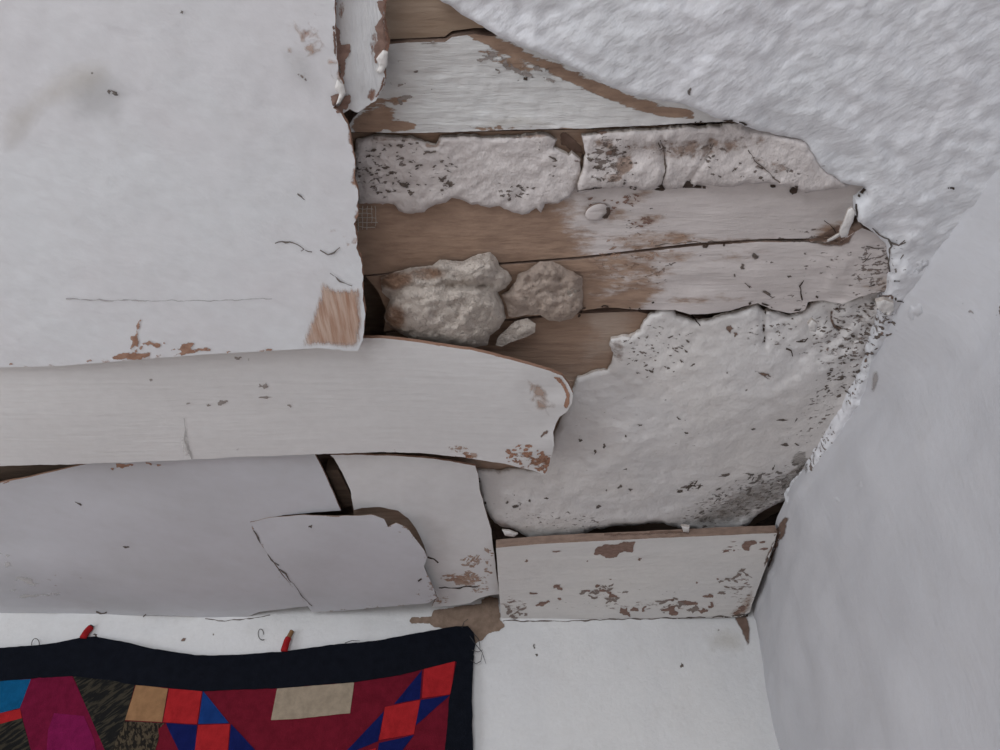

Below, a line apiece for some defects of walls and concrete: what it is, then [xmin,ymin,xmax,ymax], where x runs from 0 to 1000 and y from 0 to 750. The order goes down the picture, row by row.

peeling [373,1,388,103]
spalling [356,140,458,196]
spalling [560,131,640,212]
flaking render [827,206,856,242]
peeling [112,320,210,360]
peeling [306,286,360,345]
spalling [776,295,896,398]
peeling [505,444,550,474]
crack [253,530,312,606]
peeling [587,524,690,562]
peeling [579,569,752,617]
peeling [723,540,768,553]